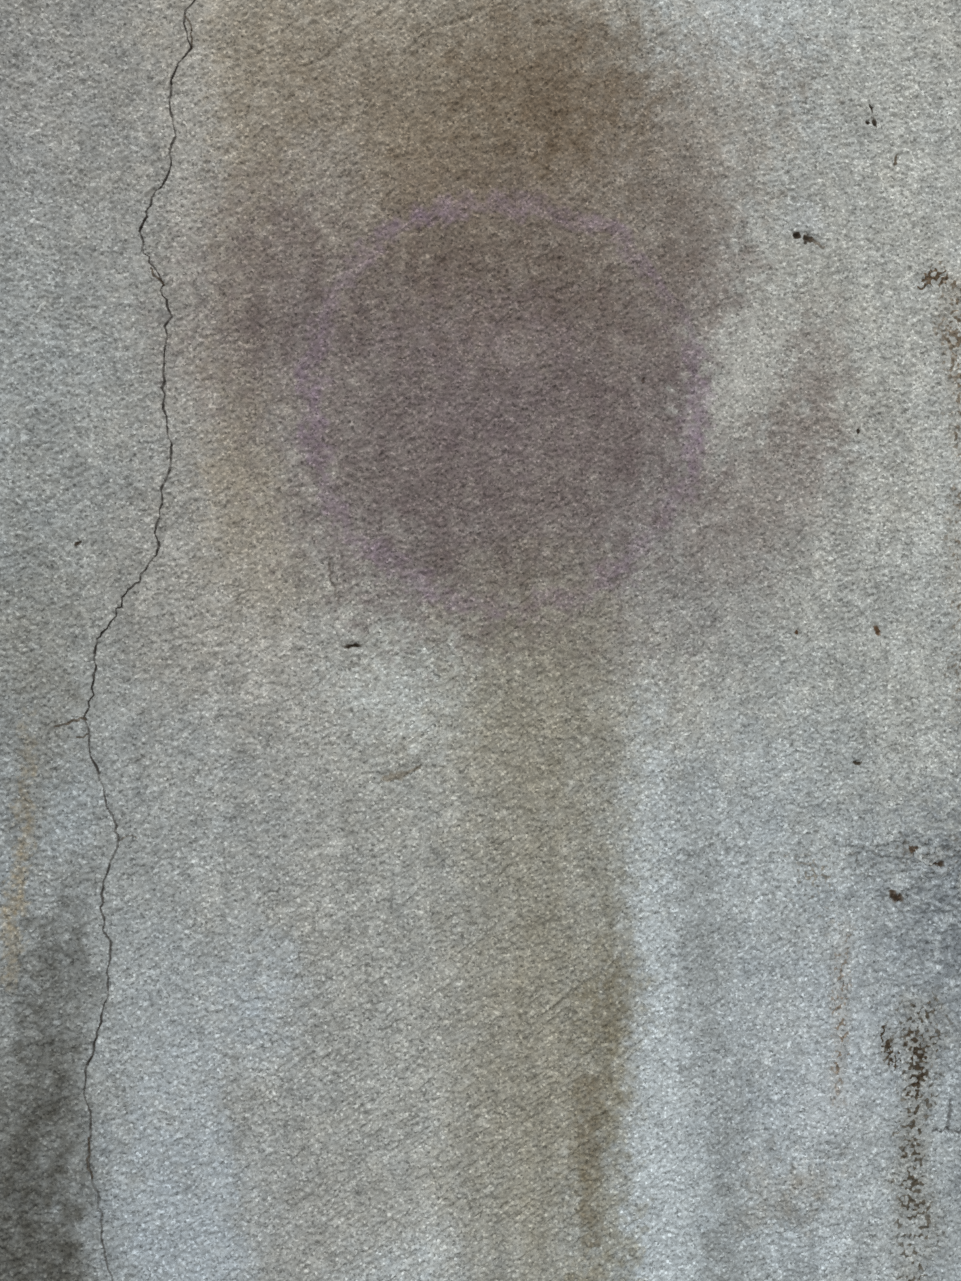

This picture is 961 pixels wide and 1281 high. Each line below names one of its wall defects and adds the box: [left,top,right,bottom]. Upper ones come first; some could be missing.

damp [156,0,315,303]
damp [712,0,816,49]
crack [53,0,196,1281]
damp [0,554,331,1281]
damp [175,388,857,1281]
damp [771,261,961,1281]